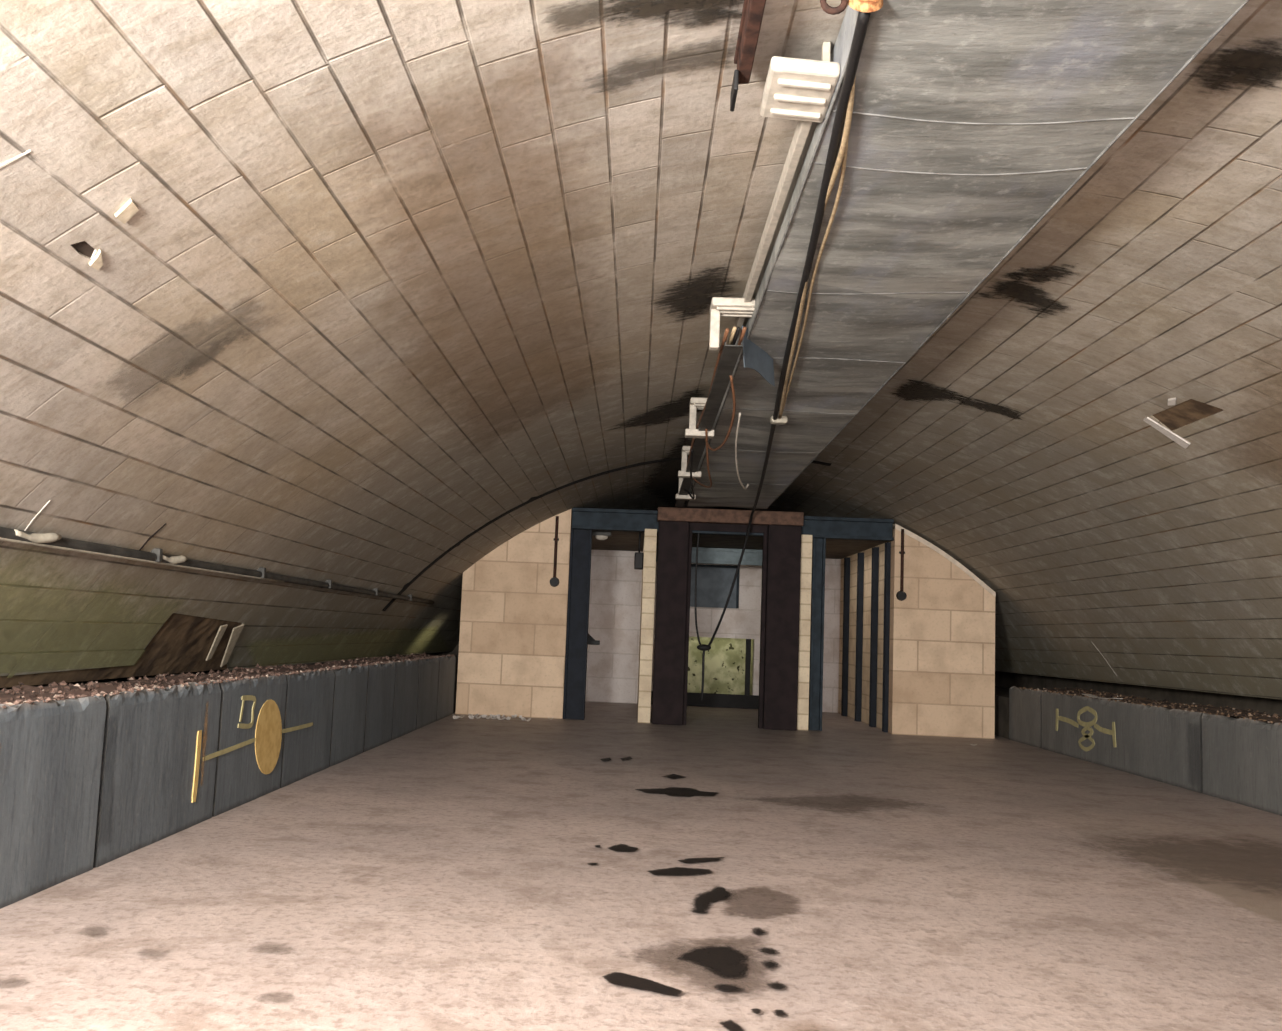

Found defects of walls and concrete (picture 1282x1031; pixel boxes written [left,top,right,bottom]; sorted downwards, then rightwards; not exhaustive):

damp [550,0,744,30]
damp [591,41,736,92]
damp [1190,40,1282,91]
damp [655,267,735,321]
damp [973,264,1074,318]
damp [612,388,703,430]
damp [891,379,1021,419]
damp [643,437,695,507]